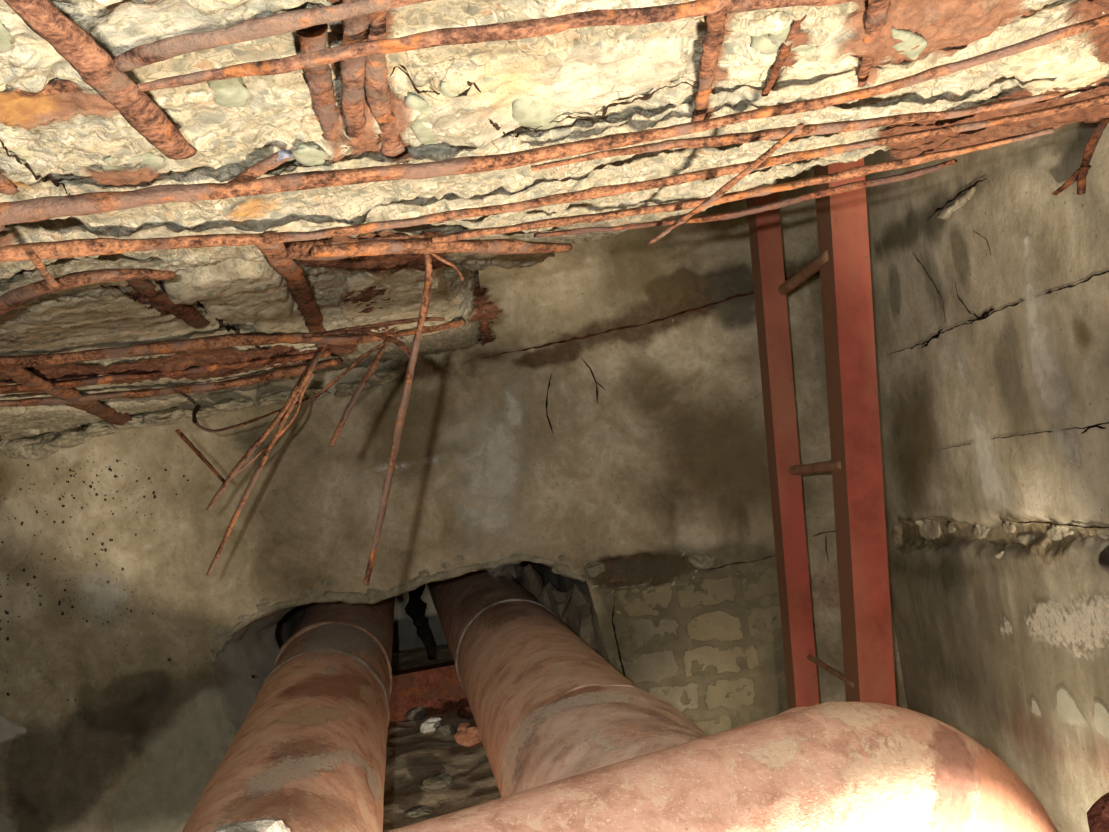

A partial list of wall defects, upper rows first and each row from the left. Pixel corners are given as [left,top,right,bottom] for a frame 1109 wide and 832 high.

rust [841,0,1031,65]
rust [1068,0,1109,64]
rust [0,95,51,122]
rust [881,77,1109,159]
rust [88,167,158,189]
rust [0,253,451,394]
rust [469,284,503,346]
spalling [0,0,1109,585]
crack [889,253,1109,355]
crack [939,422,1109,450]
flaking render [204,547,788,736]
water stain [8,673,217,832]